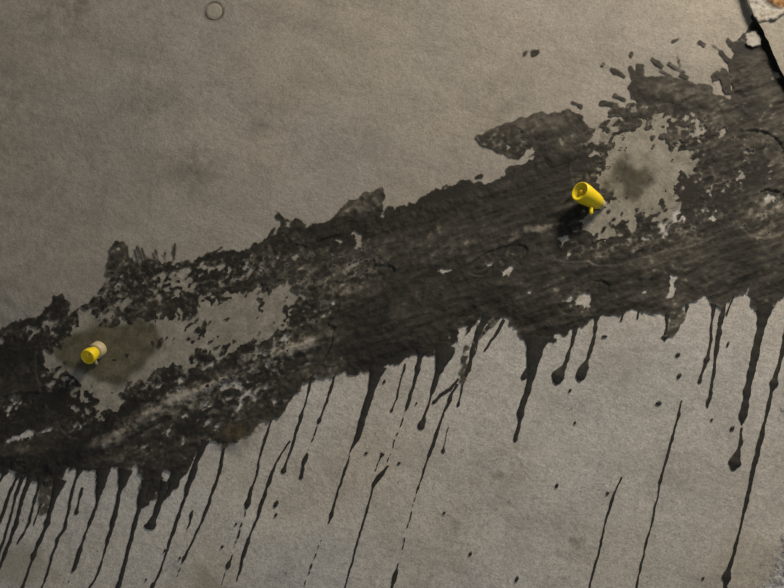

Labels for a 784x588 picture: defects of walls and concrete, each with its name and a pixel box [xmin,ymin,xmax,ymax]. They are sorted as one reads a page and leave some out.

peeling [748,0,784,22]
damp [475,109,591,162]
damp [628,57,742,127]
damp [17,477,67,588]
damp [55,318,164,383]
damp [115,480,151,588]
damp [150,439,209,588]
damp [350,363,387,452]
damp [418,343,455,430]
damp [513,335,551,442]
damp [722,333,784,588]
damp [739,305,774,425]